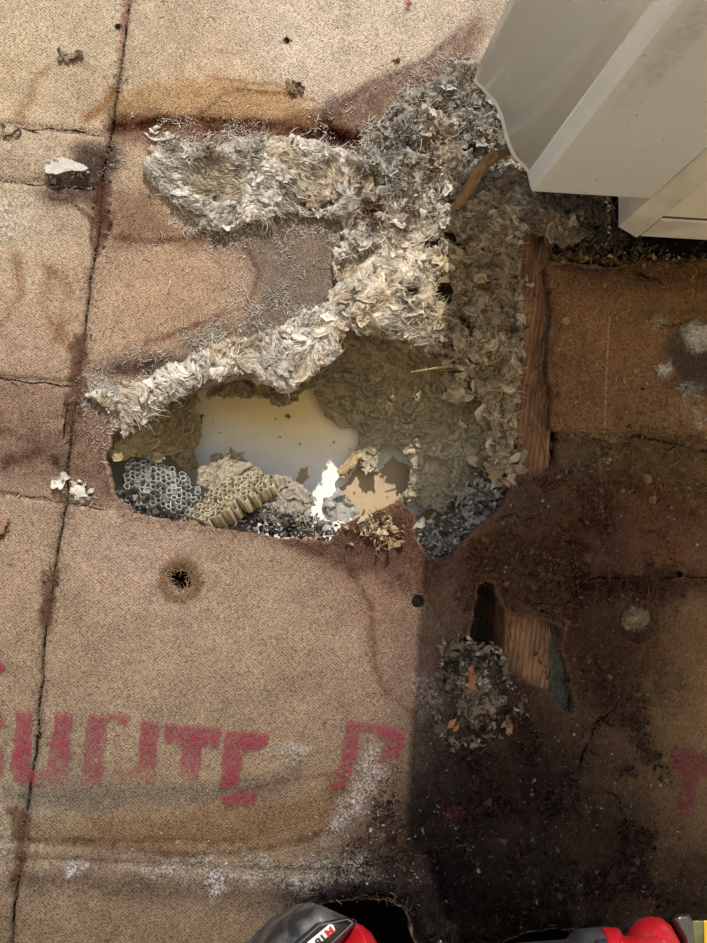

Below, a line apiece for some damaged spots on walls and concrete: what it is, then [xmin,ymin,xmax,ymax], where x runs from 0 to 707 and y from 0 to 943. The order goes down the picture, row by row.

peeling [286,78,305,96]
leakage [658,318,707,397]
peeling [296,467,309,483]
peeling [339,455,464,557]
leakage [281,455,707,937]